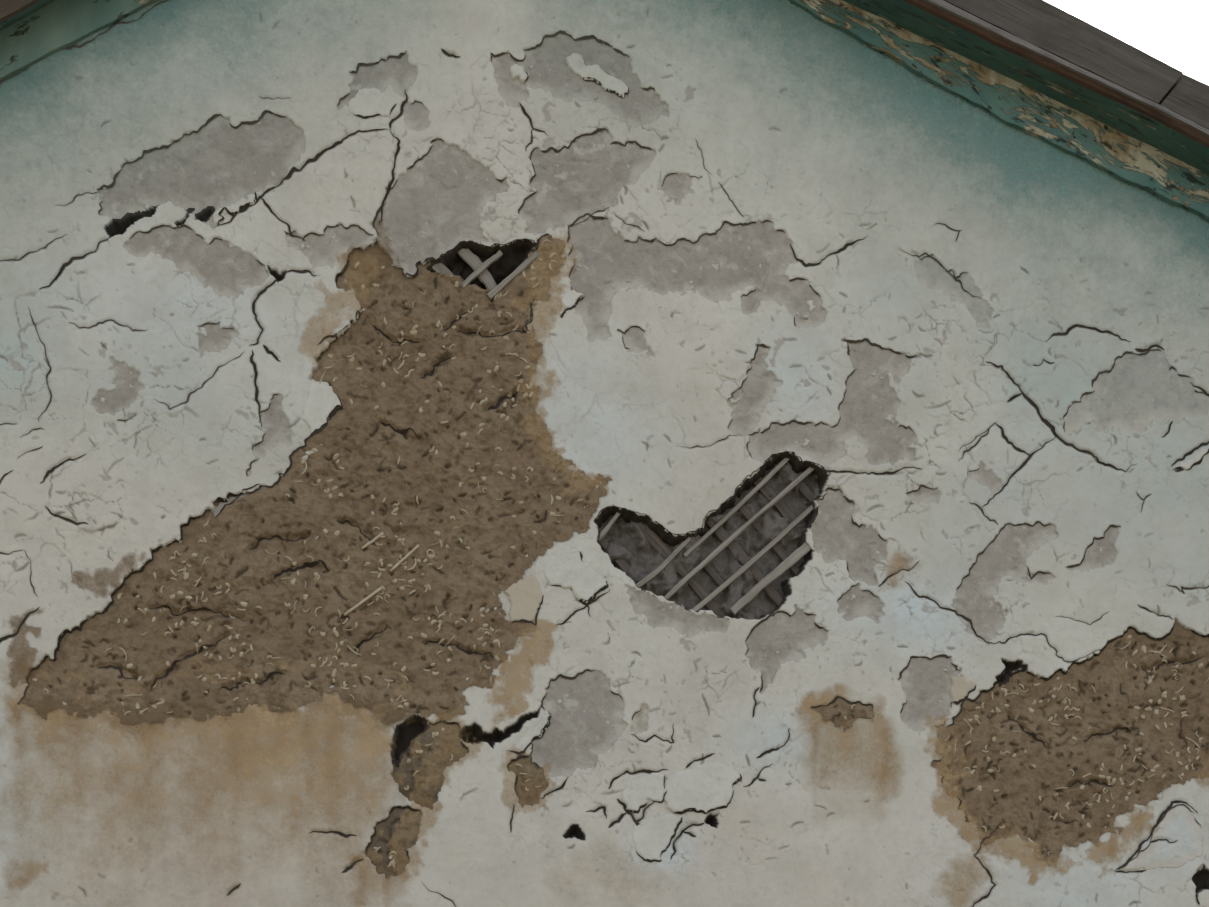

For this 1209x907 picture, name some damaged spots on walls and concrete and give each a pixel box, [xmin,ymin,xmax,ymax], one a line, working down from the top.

flaking render [97,110,305,299]
crack [214,89,408,241]
flaking render [284,51,508,277]
flaking render [490,30,826,358]
crack [0,192,110,525]
crack [118,270,318,423]
flaking render [246,381,341,477]
flaking render [727,338,919,466]
crack [959,324,1164,524]
leakage [7,610,404,836]
crack [586,723,790,862]
leakage [800,686,896,785]